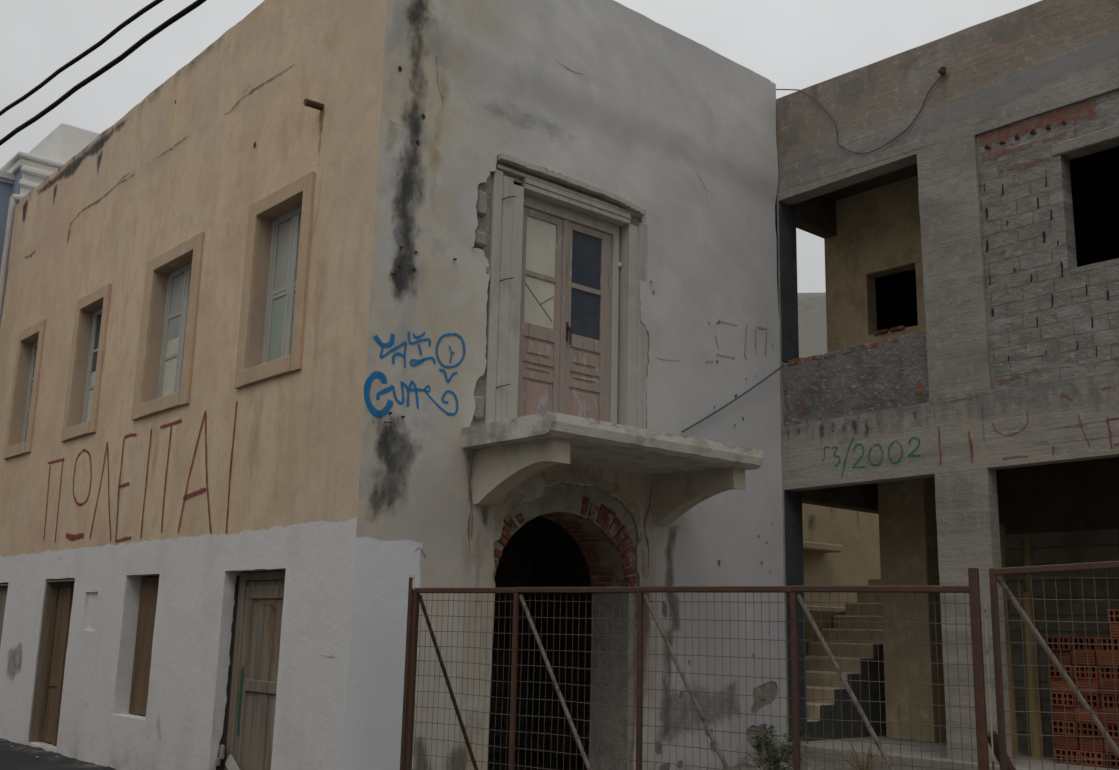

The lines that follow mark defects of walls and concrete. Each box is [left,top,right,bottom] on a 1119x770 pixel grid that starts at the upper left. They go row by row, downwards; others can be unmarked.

crack [224,64,294,115]
crack [70,174,133,227]
damp [394,104,421,293]
spalling [474,162,616,274]
spalling [470,373,485,426]
damp [380,427,412,502]